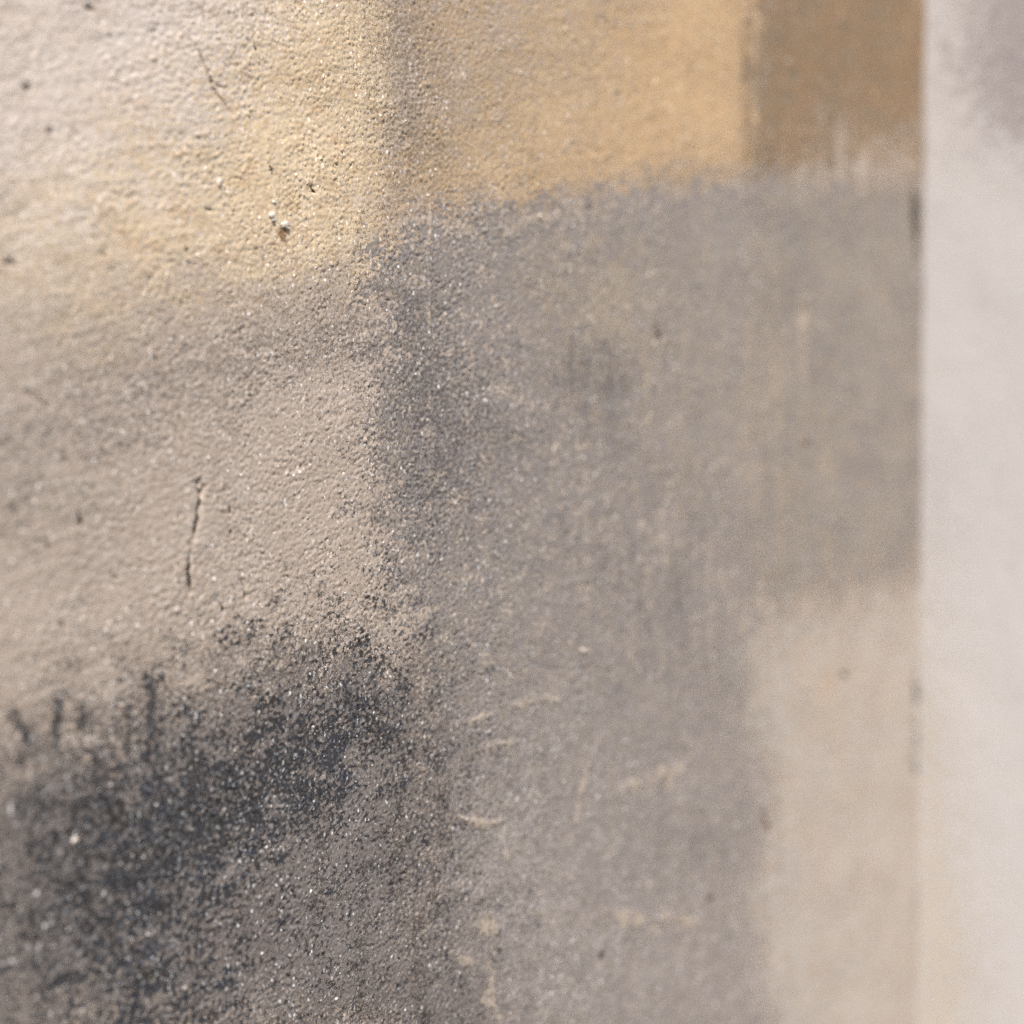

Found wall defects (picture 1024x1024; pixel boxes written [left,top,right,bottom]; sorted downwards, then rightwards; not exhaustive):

crack [186,483,203,588]